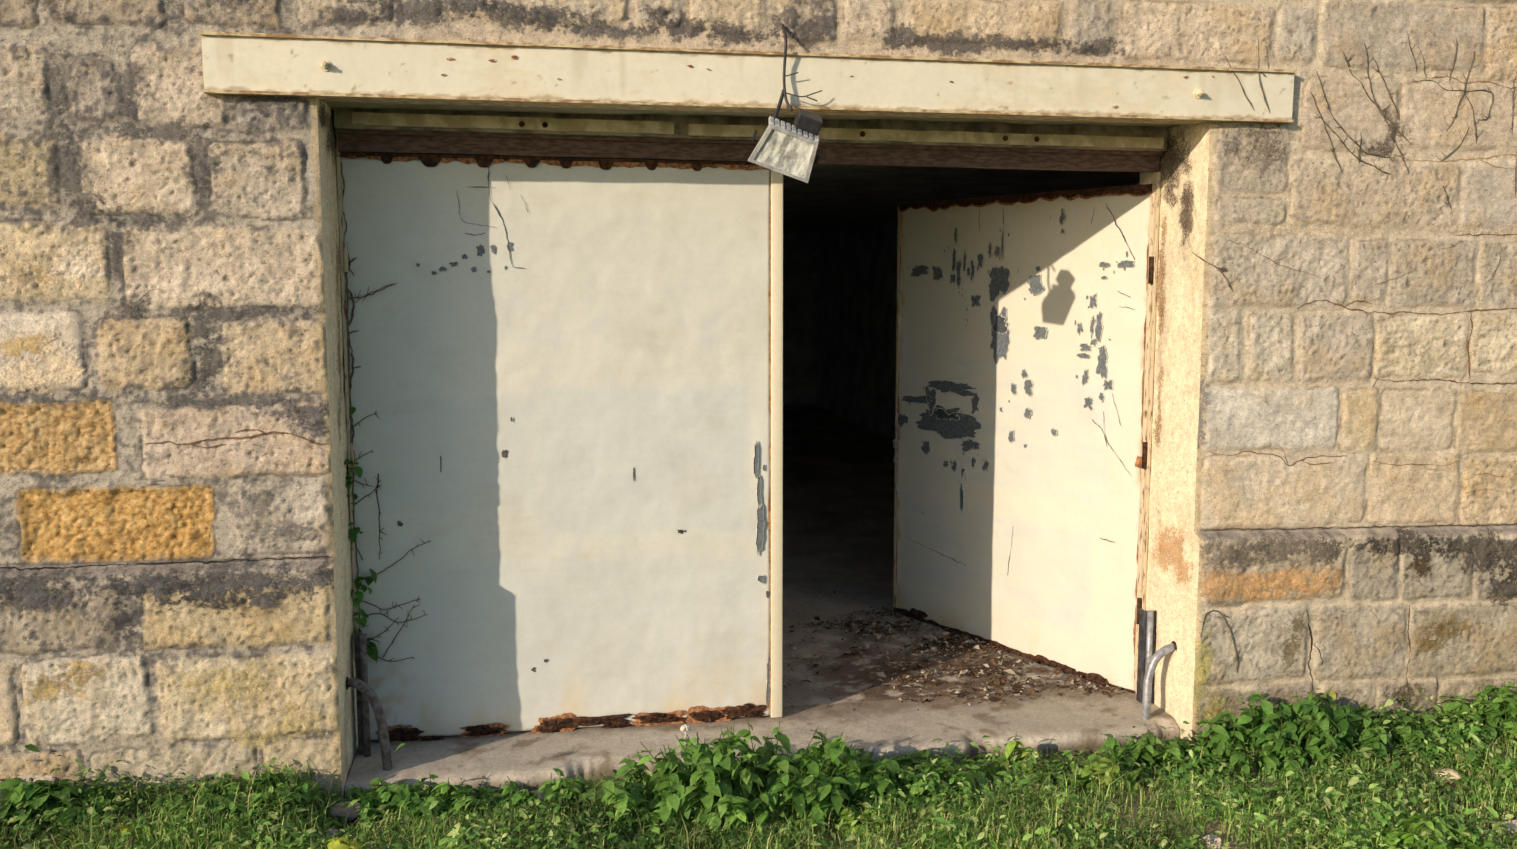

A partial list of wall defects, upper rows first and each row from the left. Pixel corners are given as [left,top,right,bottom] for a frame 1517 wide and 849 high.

water stain [318,0,839,51]
water stain [882,23,1125,56]
crack [145,162,394,449]
peeling [908,221,1045,366]
peeling [1074,251,1135,411]
crack [1225,233,1517,388]
peeling [892,380,990,514]
peeling [999,369,1033,448]
water stain [0,485,335,642]
water stain [1199,528,1517,606]
crack [1307,611,1323,690]
corrosion [375,723,510,743]